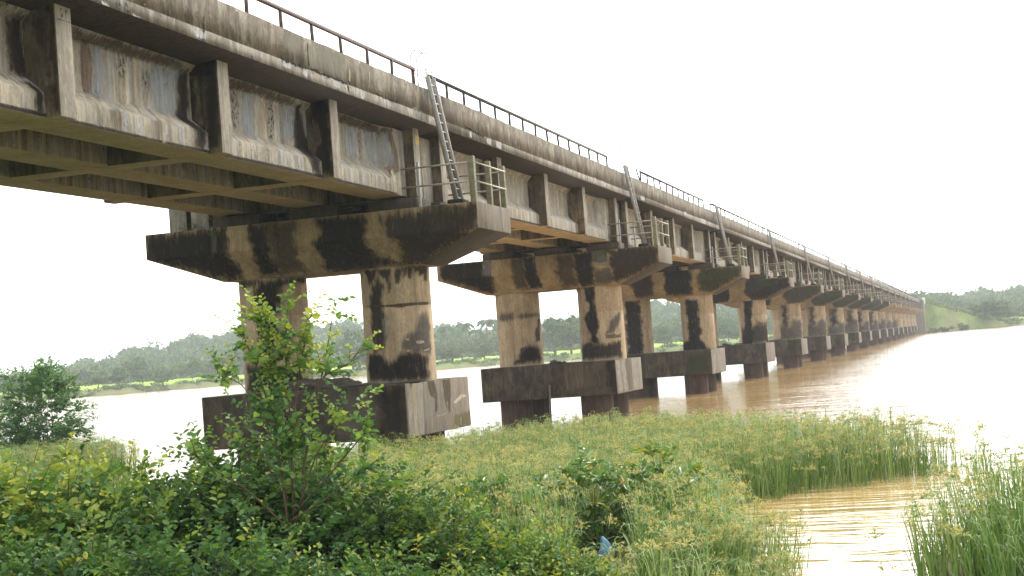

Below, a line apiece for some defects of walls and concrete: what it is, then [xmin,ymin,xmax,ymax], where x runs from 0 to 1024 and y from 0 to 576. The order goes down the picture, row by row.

leakage [0,5,397,194]
leakage [311,202,496,439]
leakage [500,207,724,394]